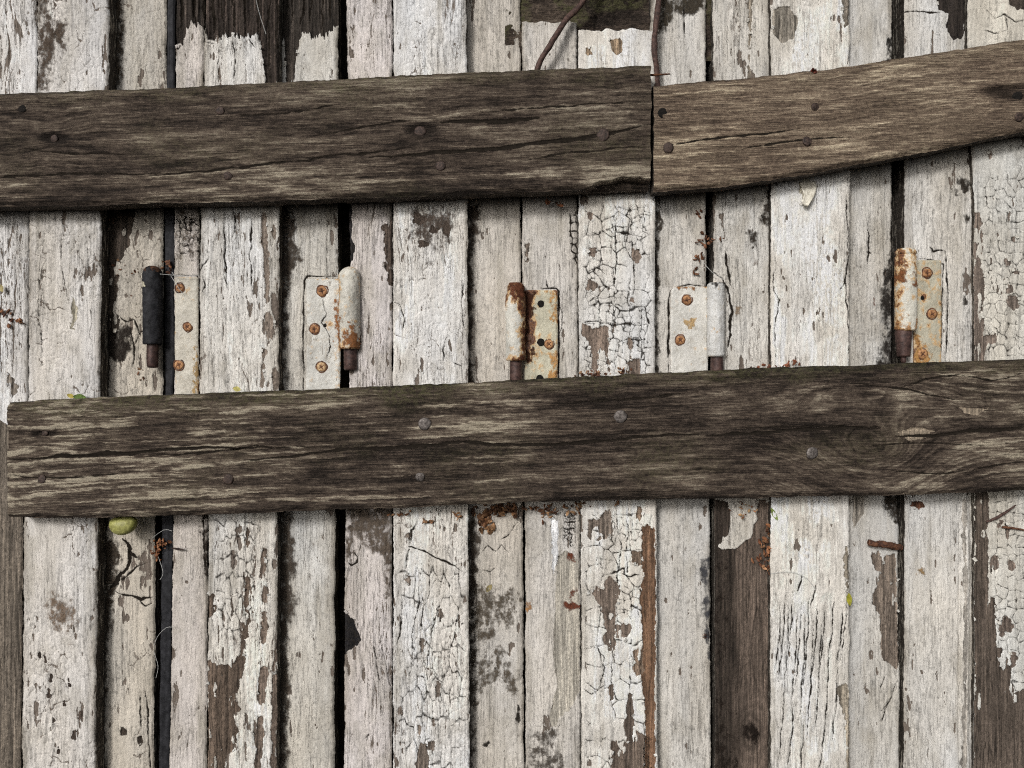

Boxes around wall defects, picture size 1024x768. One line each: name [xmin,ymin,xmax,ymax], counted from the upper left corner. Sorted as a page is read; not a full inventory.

crack [0,102,844,178]
rust [333,299,360,349]
rust [509,282,557,363]
crack [542,204,734,404]
rust [894,262,918,289]
rust [894,316,933,363]
crack [857,174,1024,400]
peeling [206,526,278,768]
crack [373,525,464,768]
peeling [549,506,658,768]
peeling [714,499,769,768]
peeling [959,492,1024,768]